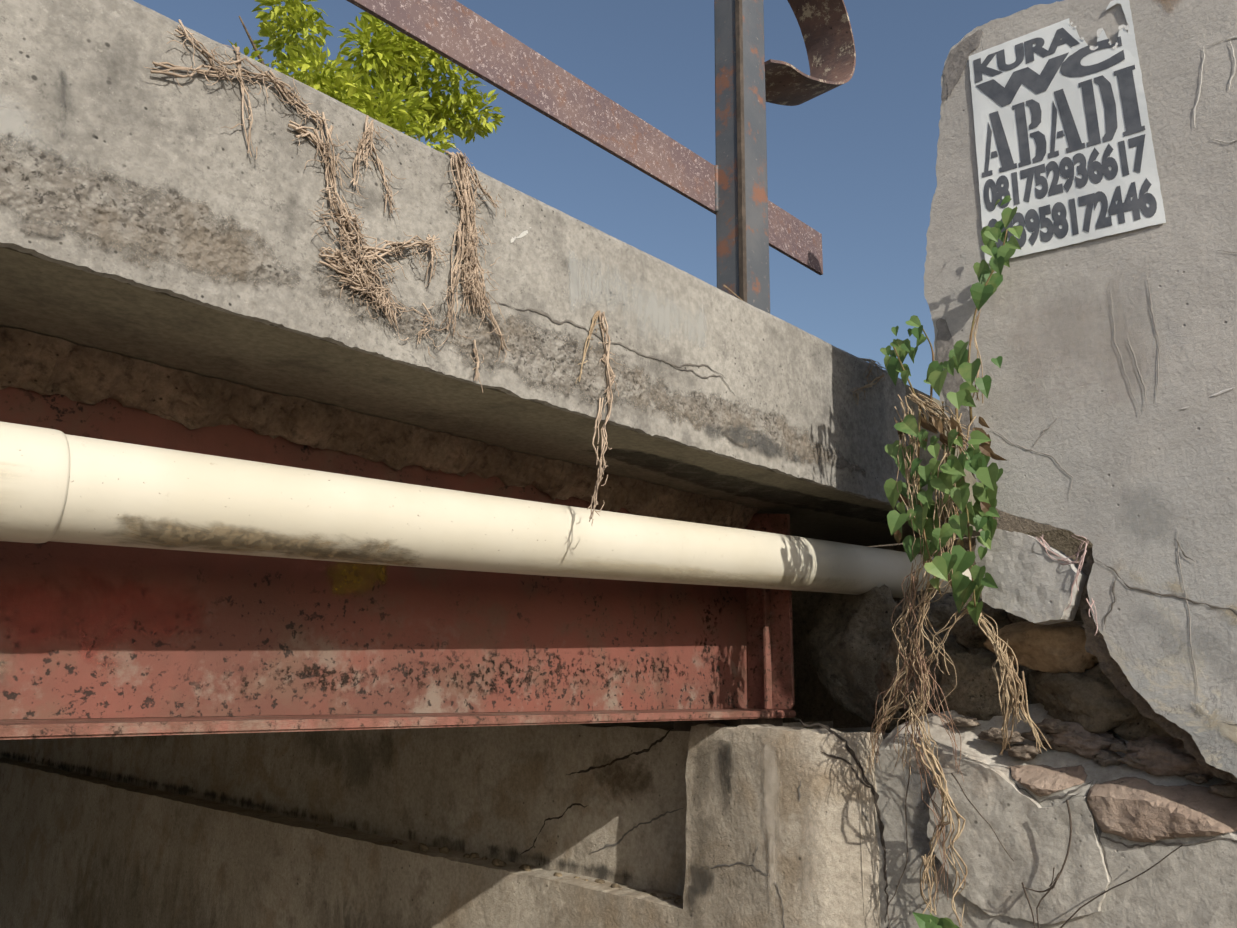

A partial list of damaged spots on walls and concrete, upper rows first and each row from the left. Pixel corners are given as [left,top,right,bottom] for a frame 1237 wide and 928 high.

crack [1193,36,1237,143]
crack [492,302,734,394]
rust [281,663,358,691]
rust [403,652,685,693]
crack [520,728,683,855]
crack [699,846,785,928]
crack [797,719,889,928]
crack [1003,766,1097,803]
flaking render [1008,765,1237,843]
crack [1095,824,1237,882]